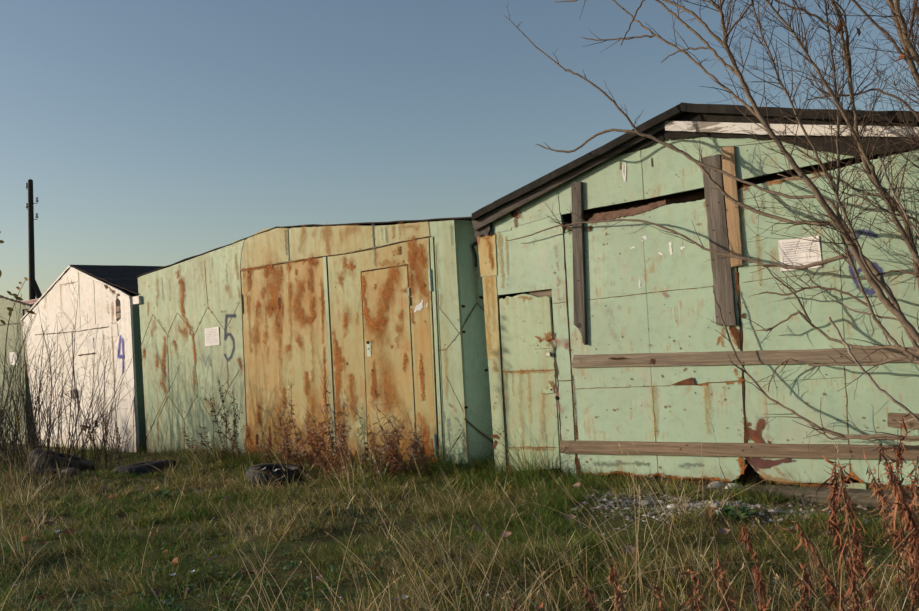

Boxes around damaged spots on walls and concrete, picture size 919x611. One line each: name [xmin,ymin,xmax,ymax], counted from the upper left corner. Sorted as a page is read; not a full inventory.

corrosion [155,272,200,392]
corrosion [235,258,358,462]
corrosion [343,226,438,466]
corrosion [727,409,771,444]